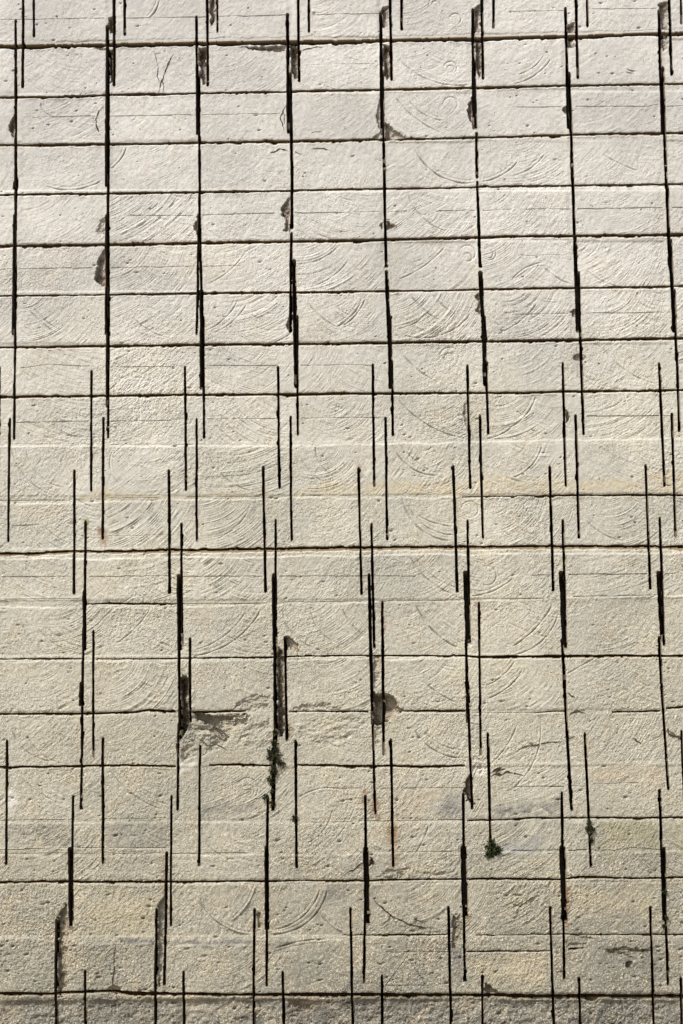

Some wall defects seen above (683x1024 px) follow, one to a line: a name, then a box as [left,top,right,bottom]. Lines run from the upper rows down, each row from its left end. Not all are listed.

spalling [198,47,207,85]
spalling [371,98,408,142]
spalling [280,194,291,233]
spalling [93,216,106,287]
spalling [180,635,343,763]
spalling [373,657,405,750]
leakage [485,788,567,864]